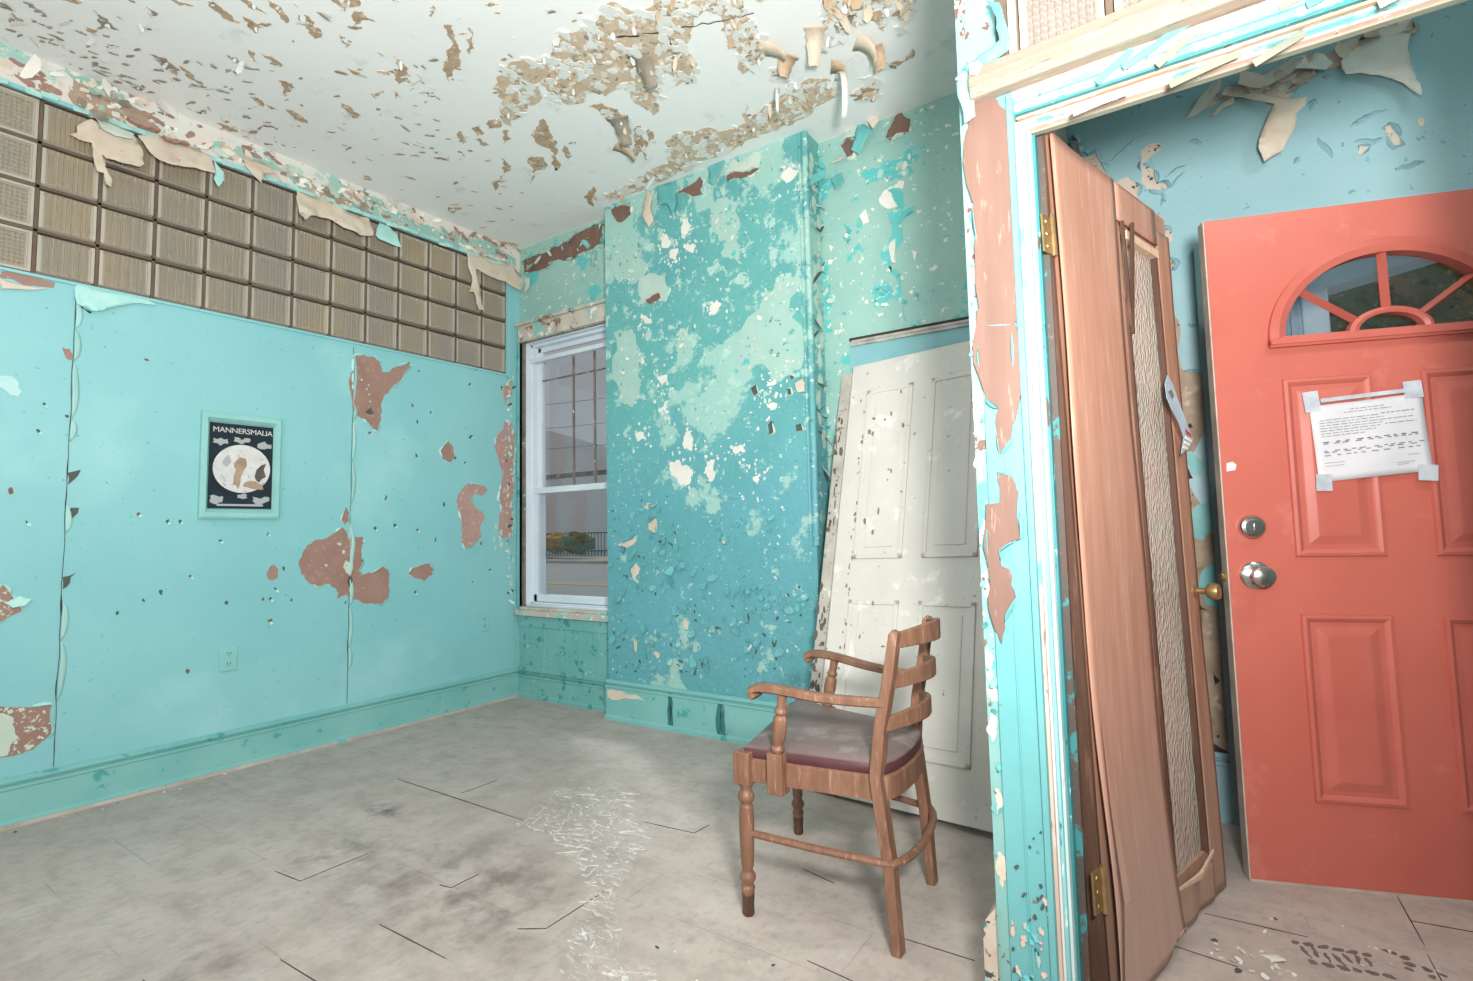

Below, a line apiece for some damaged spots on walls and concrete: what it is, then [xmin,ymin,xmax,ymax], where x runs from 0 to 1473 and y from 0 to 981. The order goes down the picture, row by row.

peeling [1068,19,1424,198]
peeling [0,0,921,545]
peeling [0,584,32,624]
peeling [262,508,398,625]
peeling [408,562,434,595]
peeling [443,375,516,608]
peeling [607,499,784,701]
peeling [958,98,1025,742]
peeling [1175,317,1229,755]
peeling [0,702,55,758]
peeling [993,851,1019,889]
peeling [1010,884,1048,981]